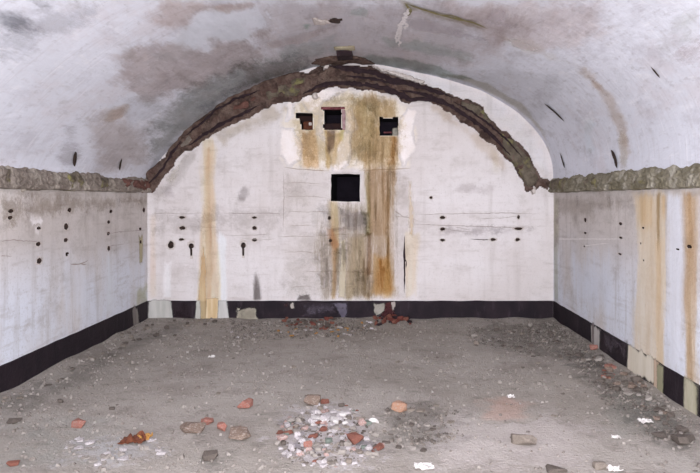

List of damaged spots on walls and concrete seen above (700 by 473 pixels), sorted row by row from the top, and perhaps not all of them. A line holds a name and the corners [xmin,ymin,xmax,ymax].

peeling [146,2,272,65]
water stain [394,8,410,47]
spalling [0,46,700,221]
rust [199,254,218,319]
rust [627,189,666,388]
rust [684,378,697,415]